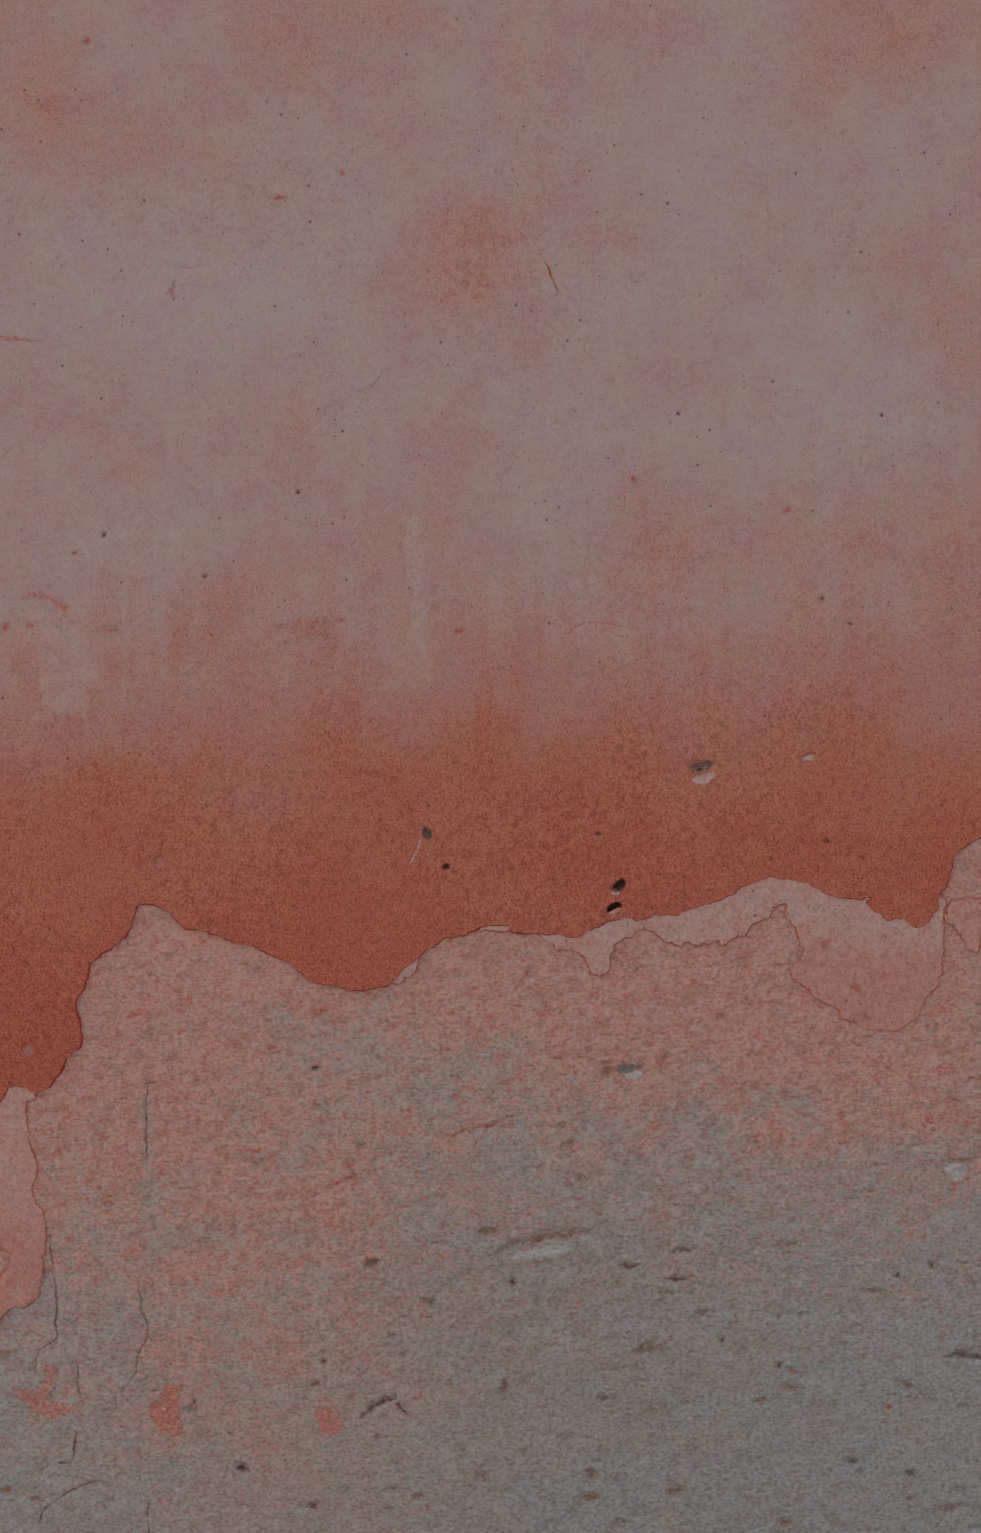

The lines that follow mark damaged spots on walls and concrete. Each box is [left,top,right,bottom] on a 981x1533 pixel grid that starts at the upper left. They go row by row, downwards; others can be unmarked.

flaking render [0,837,981,1533]